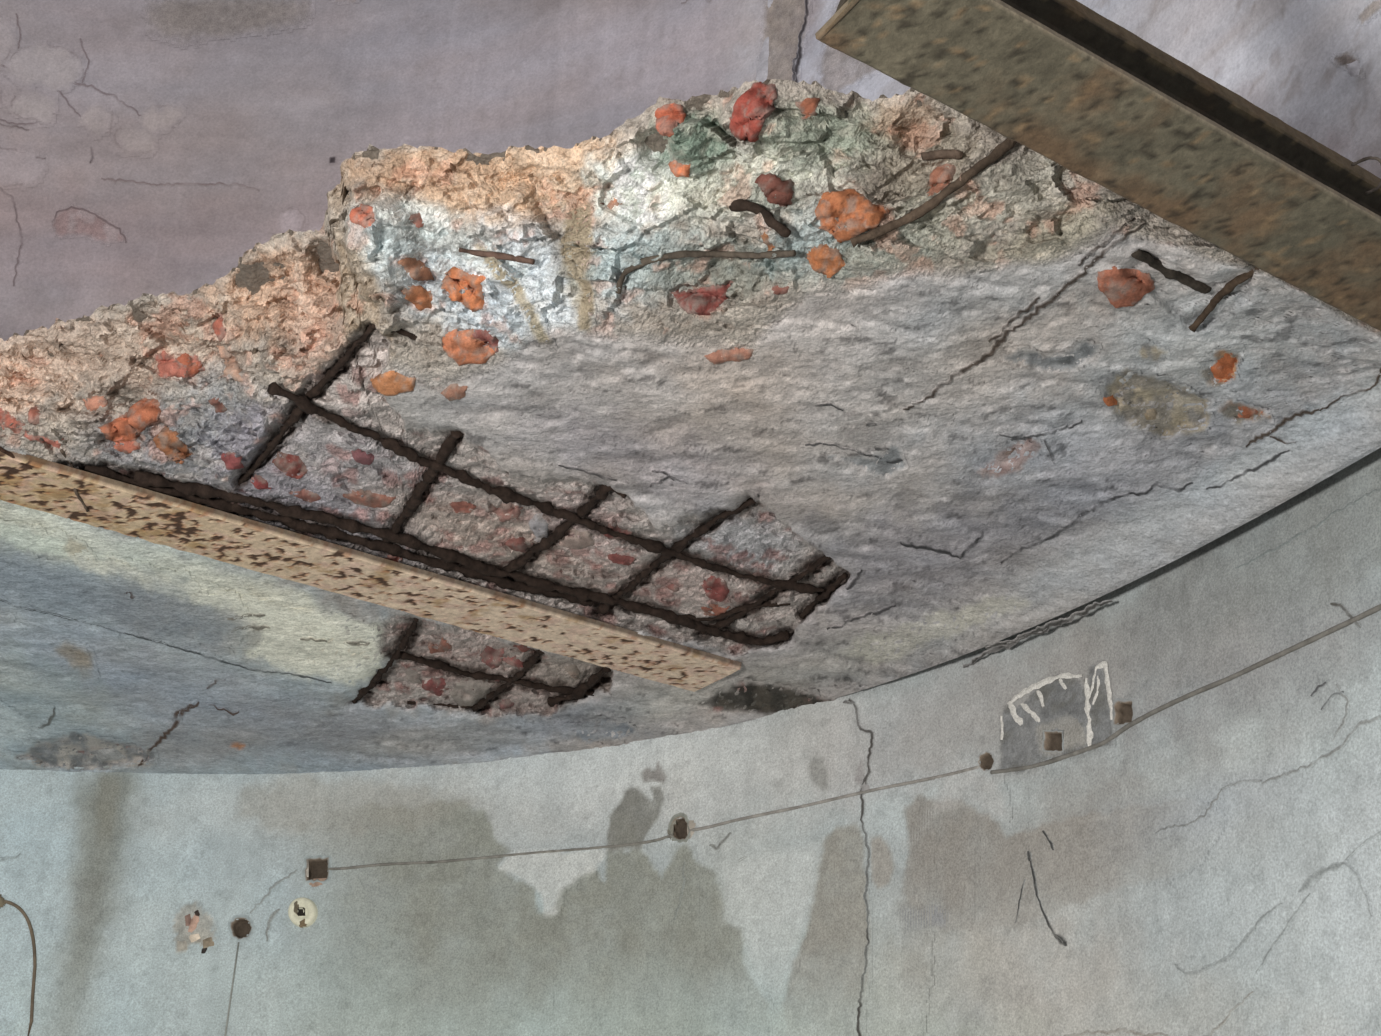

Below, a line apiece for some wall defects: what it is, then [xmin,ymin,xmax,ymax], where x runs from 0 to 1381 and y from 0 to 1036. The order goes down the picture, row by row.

crack [792,0,809,83]
spalling [0,0,1381,656]
crack [805,217,1147,464]
crack [900,366,1381,569]
water stain [0,536,261,656]
crack [0,599,332,769]
spalling [351,615,638,745]
spalling [695,678,836,718]
peeling [977,660,1137,775]
water stain [42,766,148,1036]
water stain [222,753,1227,1036]
crack [843,698,875,1036]